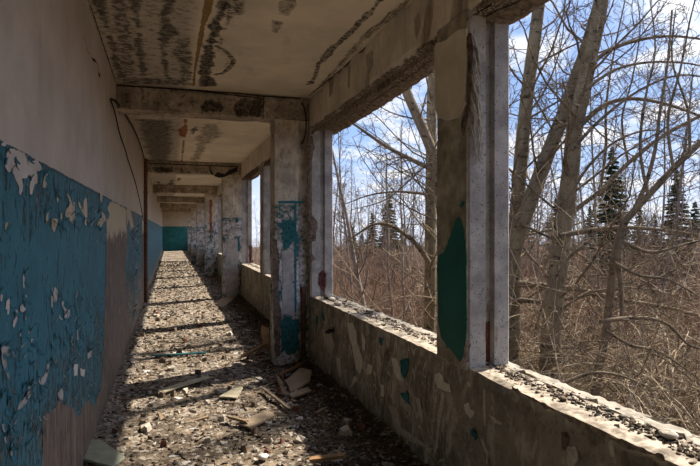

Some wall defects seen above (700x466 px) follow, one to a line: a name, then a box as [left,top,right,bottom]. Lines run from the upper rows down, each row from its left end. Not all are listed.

leakage [92,0,244,87]
peeling [307,0,409,86]
leakage [200,98,223,112]
leakage [234,95,266,118]
spalling [461,33,483,164]
peeling [1,142,50,197]
spalling [306,44,434,262]
peeling [0,190,144,466]
peeling [272,218,300,358]
rust [318,270,327,291]
peeling [347,322,384,388]
peeling [436,217,471,363]